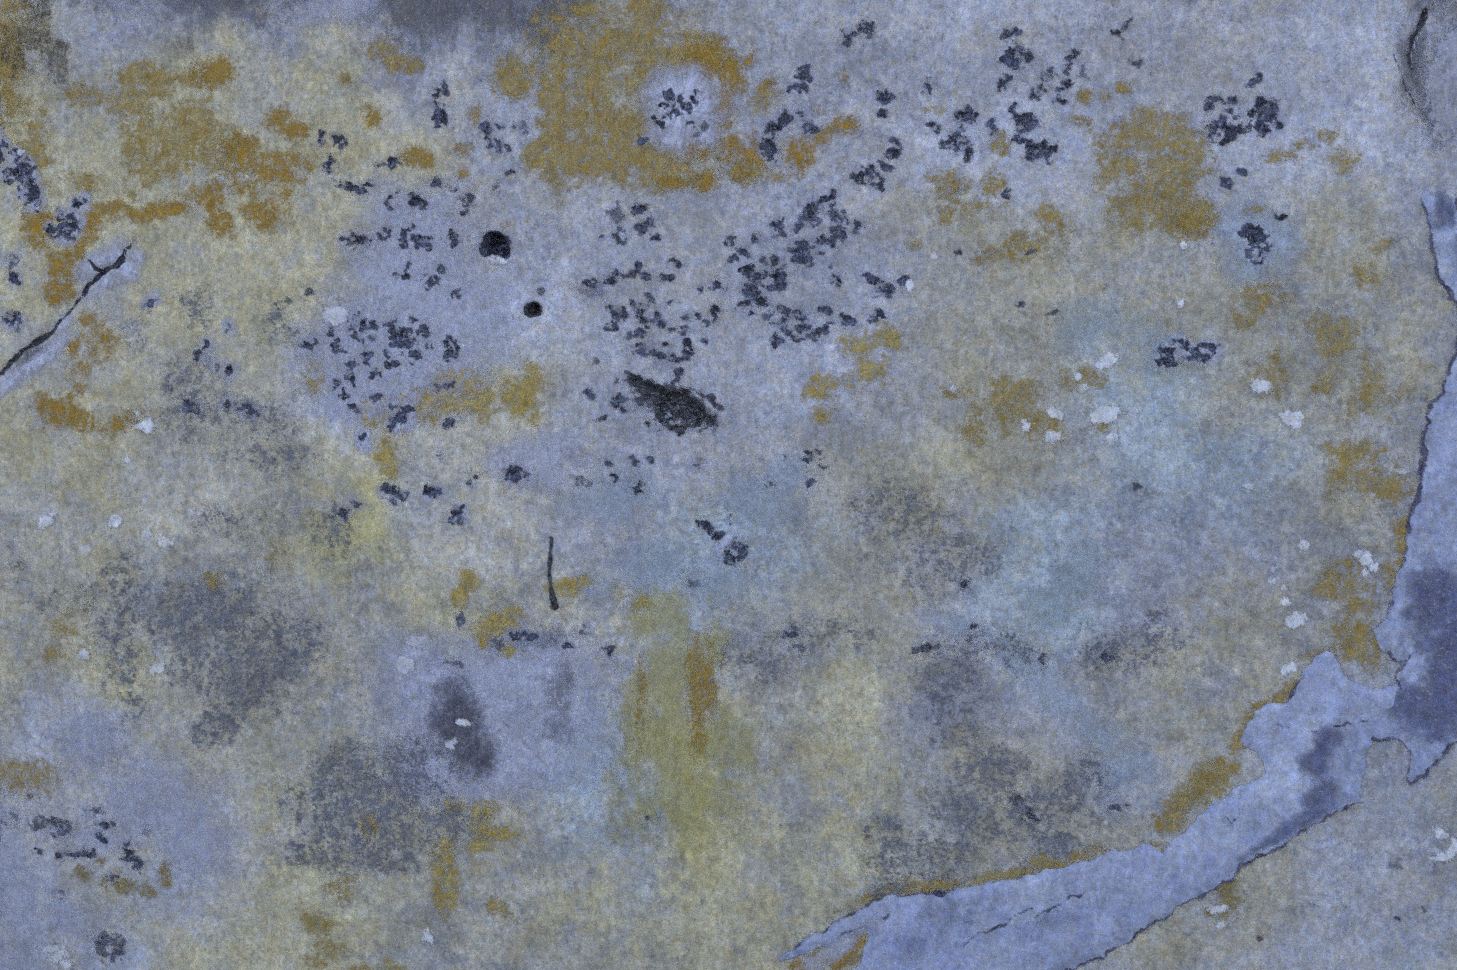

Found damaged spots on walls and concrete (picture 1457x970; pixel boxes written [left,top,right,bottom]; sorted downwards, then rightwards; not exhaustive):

crack [0,244,131,375]
rust [0,0,319,437]
damp [158,358,319,475]
damp [262,194,503,422]
spalling [637,88,698,145]
rust [491,0,860,208]
spalling [581,136,914,436]
rust [1069,80,1219,243]
spalling [1153,332,1222,369]
spalling [1231,213,1288,267]
crack [1393,3,1441,135]
damp [277,618,595,876]